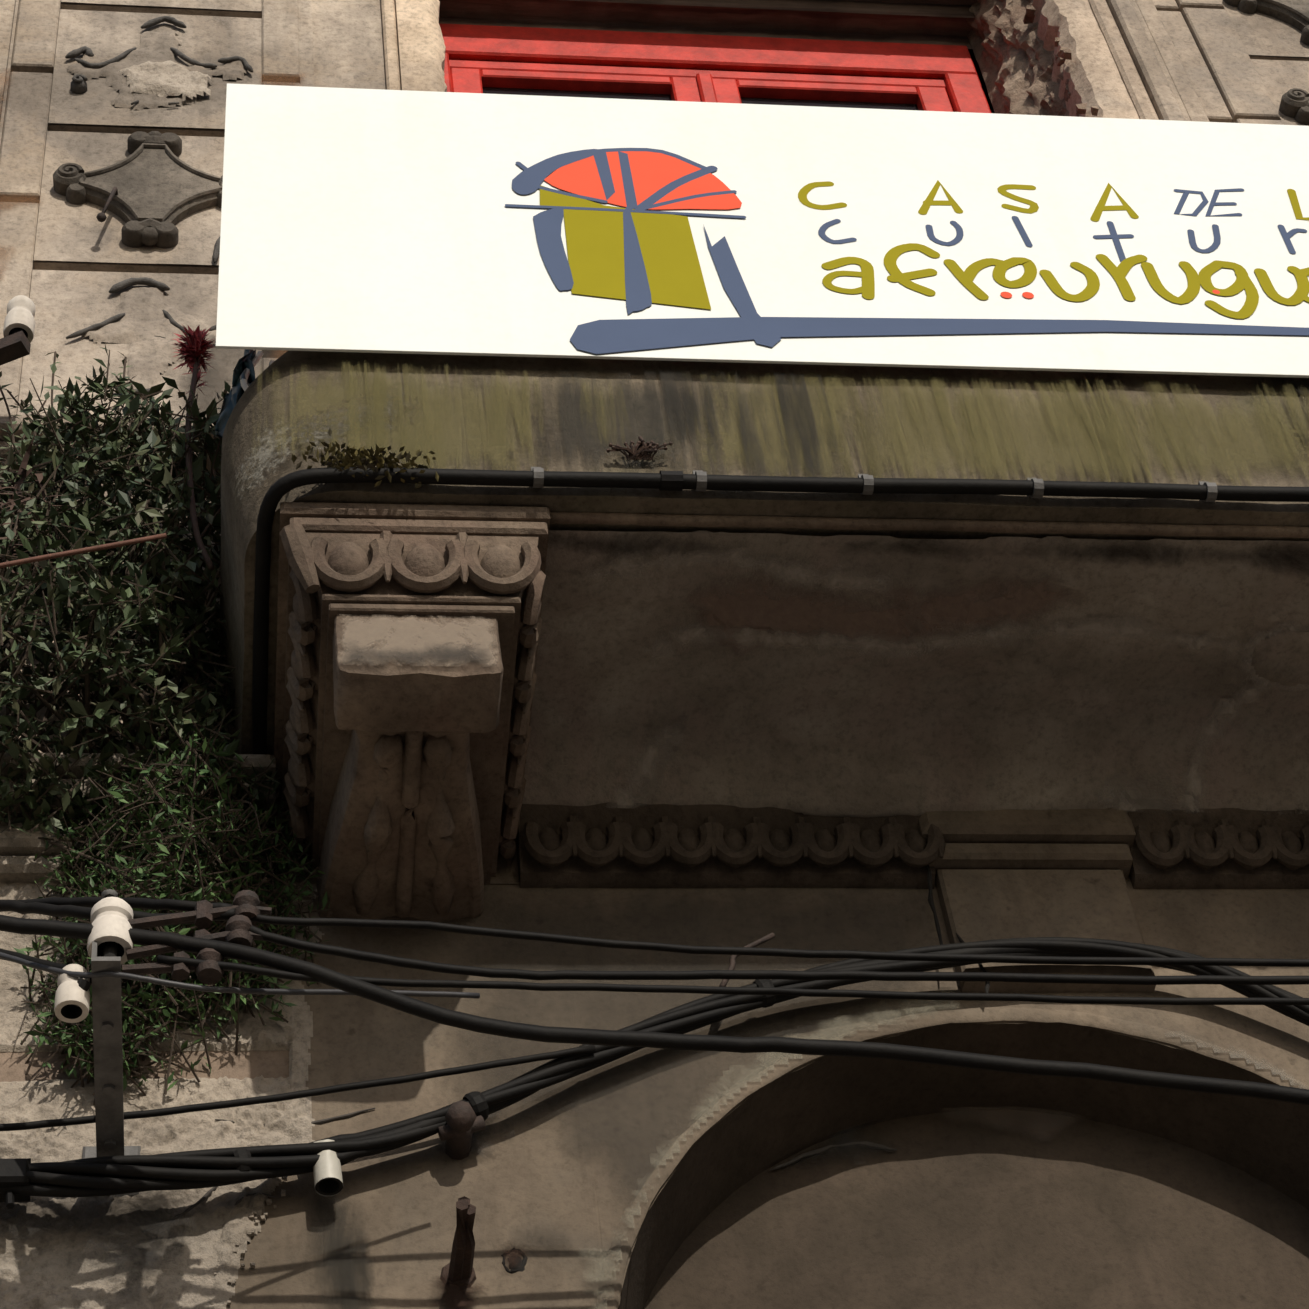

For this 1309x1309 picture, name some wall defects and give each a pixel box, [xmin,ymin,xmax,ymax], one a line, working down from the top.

spalling [65,16,253,110]
water stain [542,373,686,461]
water stain [339,616,495,666]
rust [436,1278,480,1309]